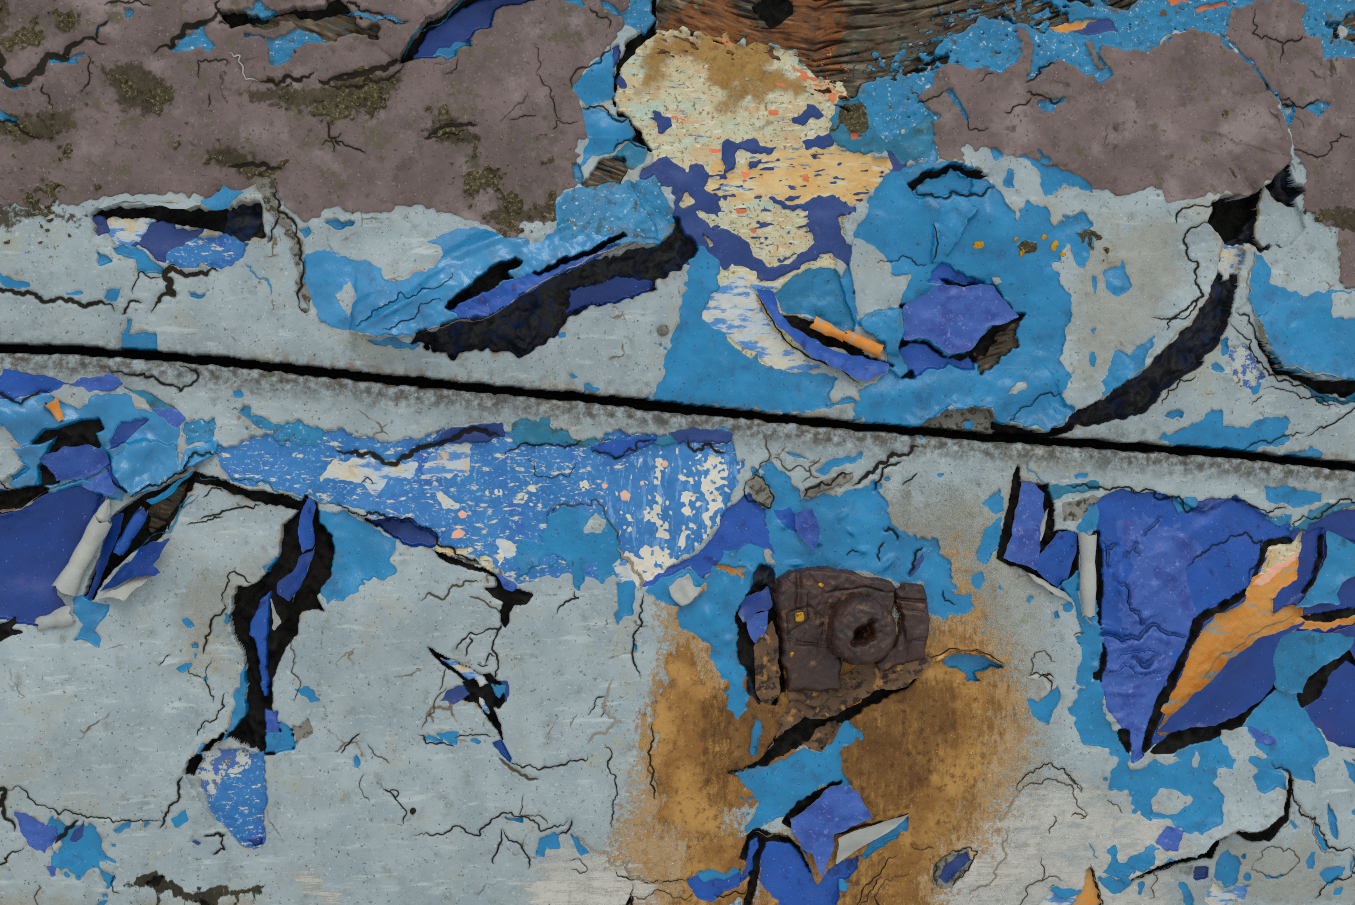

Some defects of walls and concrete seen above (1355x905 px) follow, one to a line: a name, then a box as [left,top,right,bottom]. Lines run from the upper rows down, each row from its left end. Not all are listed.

peeling [564,0,1355,452]
crack [341,733,407,824]
peeling [0,366,985,905]
crack [557,591,579,613]
crack [588,593,658,826]
rust [590,518,1048,905]
peeling [977,461,1355,905]
peeling [1267,446,1323,459]